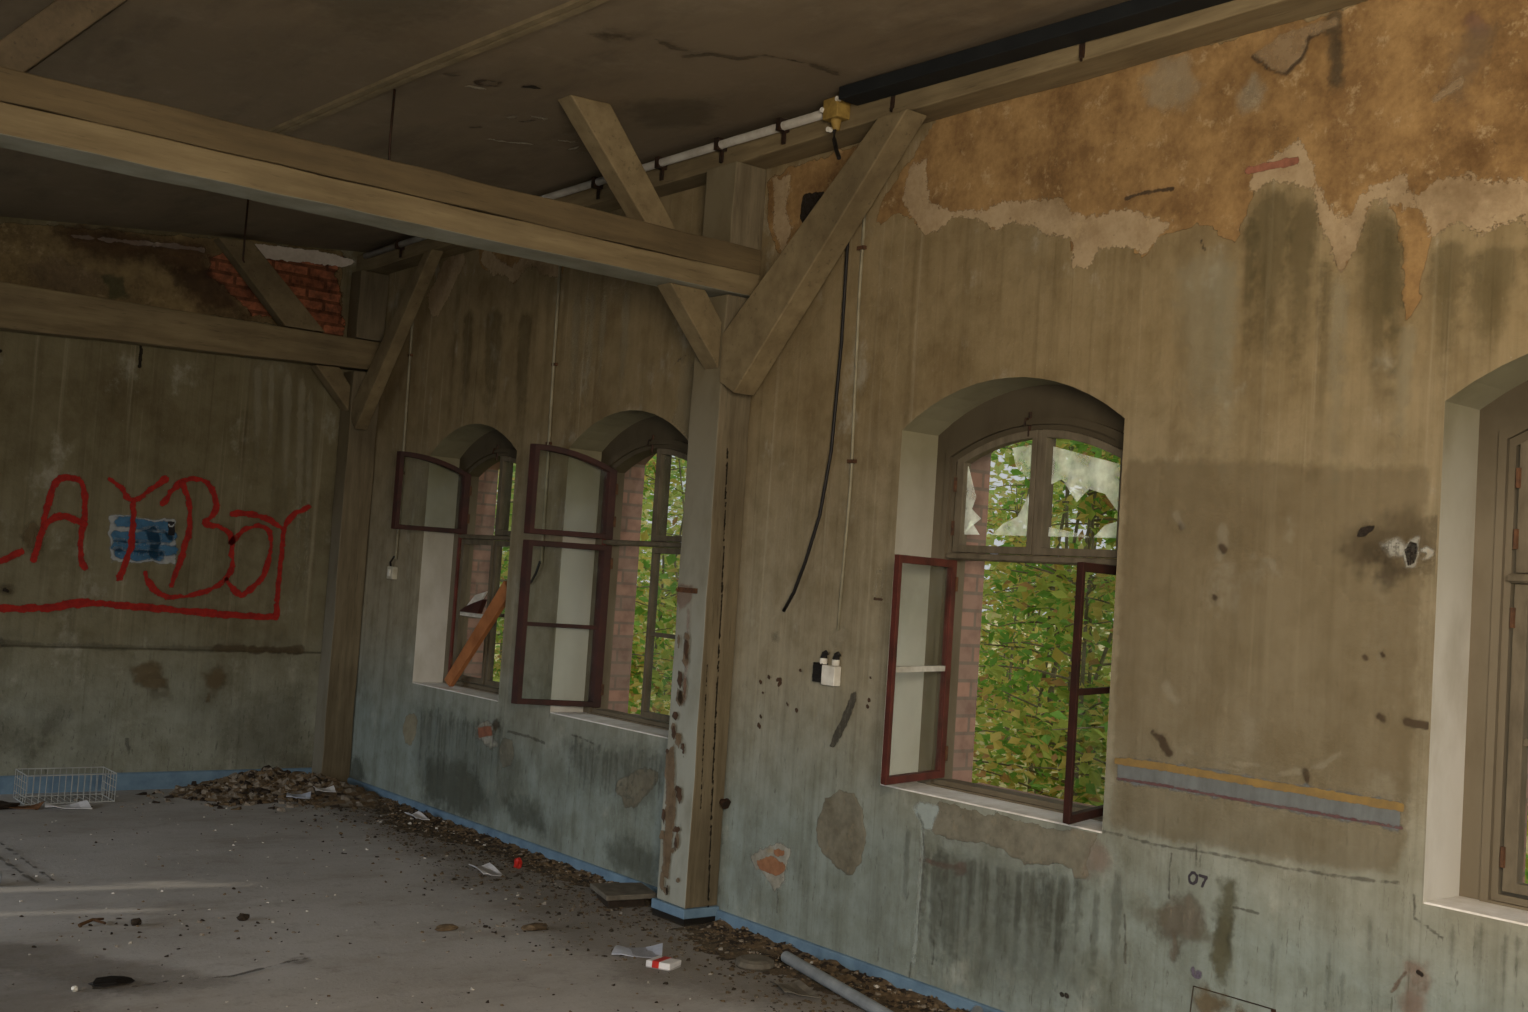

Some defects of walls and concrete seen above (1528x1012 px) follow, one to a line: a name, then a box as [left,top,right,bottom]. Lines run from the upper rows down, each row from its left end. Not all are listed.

crack [660,42,838,75]
peeling [767,145,858,254]
peeling [876,0,1528,320]
peeling [0,222,278,326]
flaking render [238,239,345,336]
peeling [659,632,690,895]
flaking render [751,843,790,891]
damp [1159,881,1234,978]